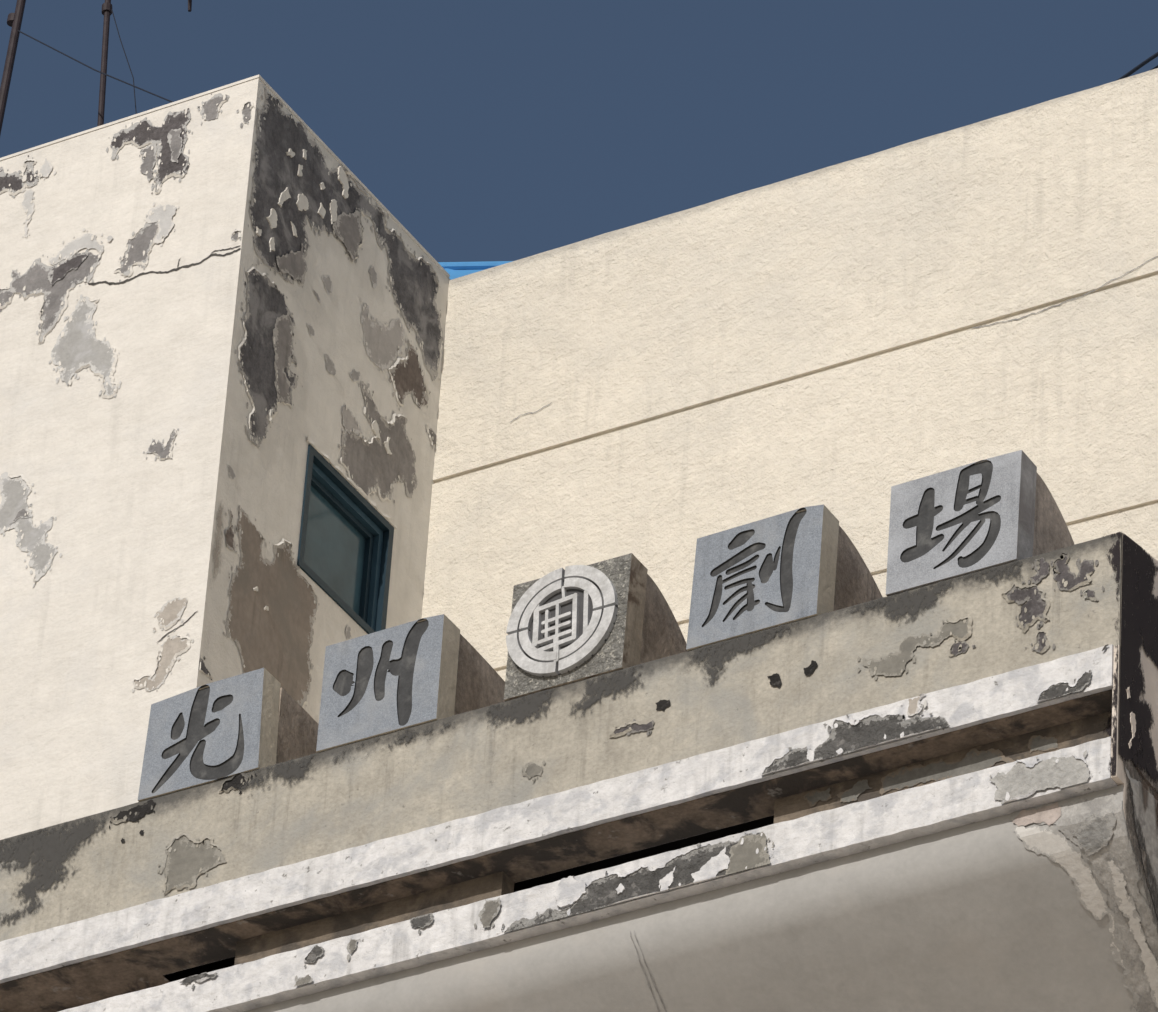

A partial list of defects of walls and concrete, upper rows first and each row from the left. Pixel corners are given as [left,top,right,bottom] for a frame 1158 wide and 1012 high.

peeling [0,155,56,238]
peeling [0,228,122,399]
crack [88,245,241,285]
peeling [106,87,443,503]
peeling [0,472,62,588]
peeling [132,597,194,693]
peeling [223,505,319,708]
peeling [1001,552,1104,654]
spalling [761,694,950,776]
peeling [157,833,226,897]
peeling [474,831,774,935]
spalling [804,735,1158,1012]